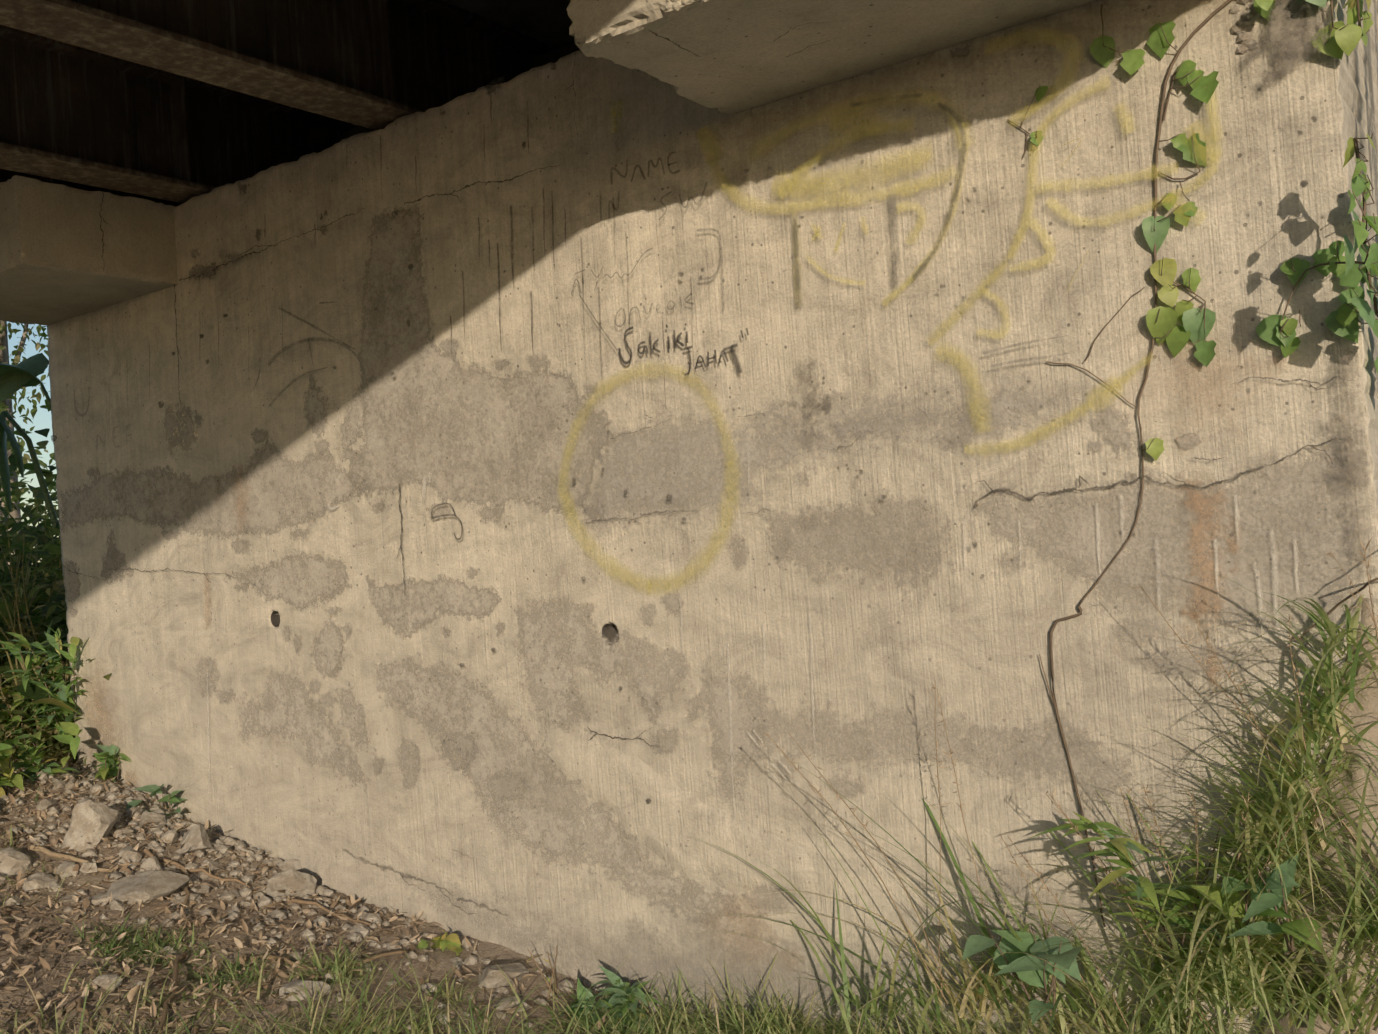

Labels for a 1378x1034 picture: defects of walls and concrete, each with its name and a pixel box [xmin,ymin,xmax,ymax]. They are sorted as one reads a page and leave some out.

damp [579,385,1054,529]
crack [971,437,1346,507]